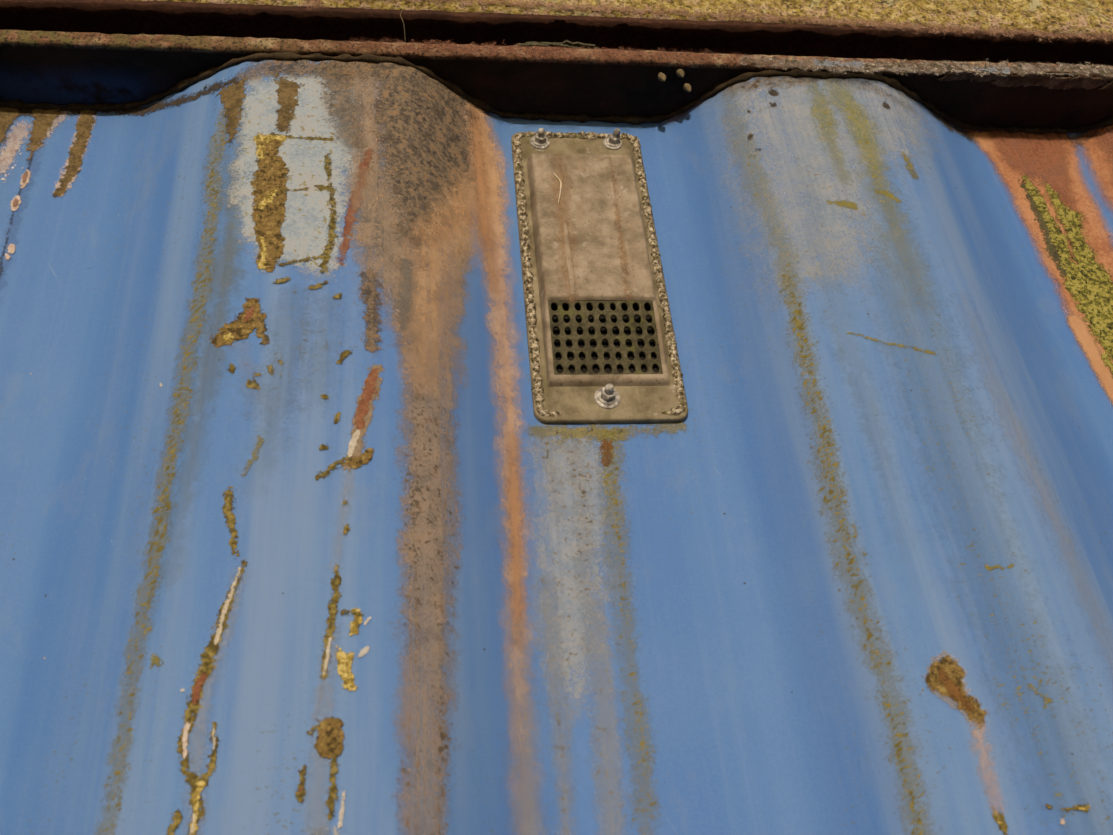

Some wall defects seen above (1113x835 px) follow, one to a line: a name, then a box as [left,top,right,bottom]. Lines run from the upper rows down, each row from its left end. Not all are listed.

peeling [741,56,1113,77]
peeling [216,74,357,300]
rust [971,125,1113,403]
rust [0,59,528,835]
peeling [315,444,374,481]
rust [925,655,989,767]